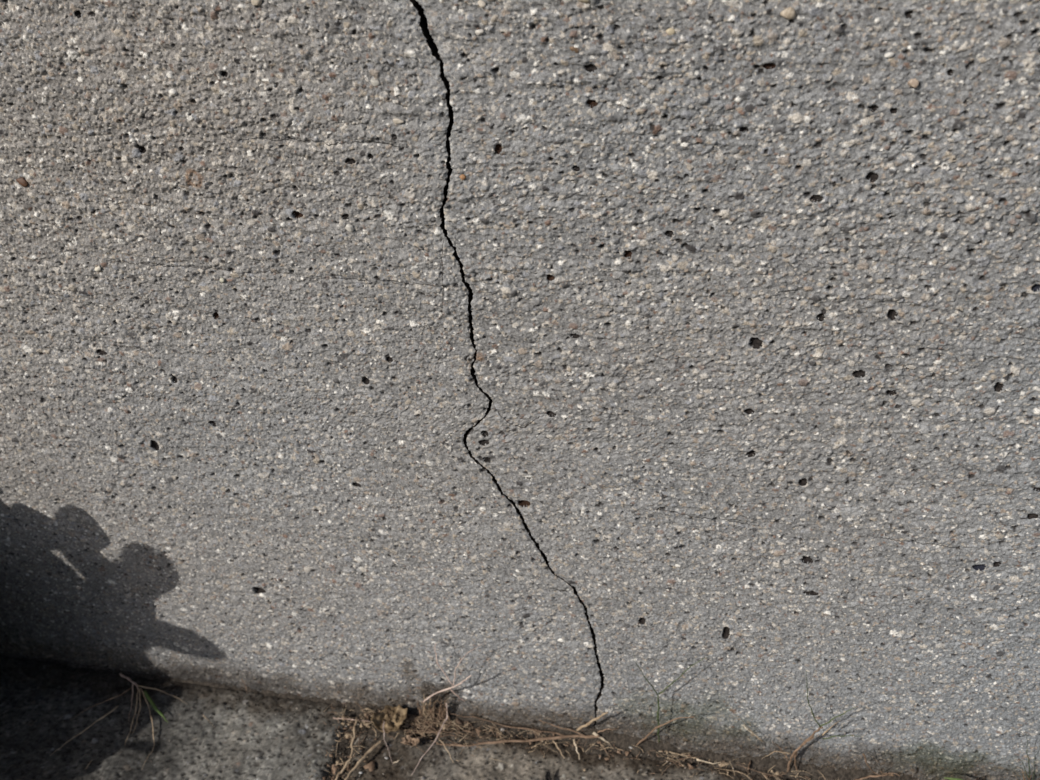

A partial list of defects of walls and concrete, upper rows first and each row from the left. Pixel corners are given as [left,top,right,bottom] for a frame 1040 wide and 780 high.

crack [105,0,604,726]